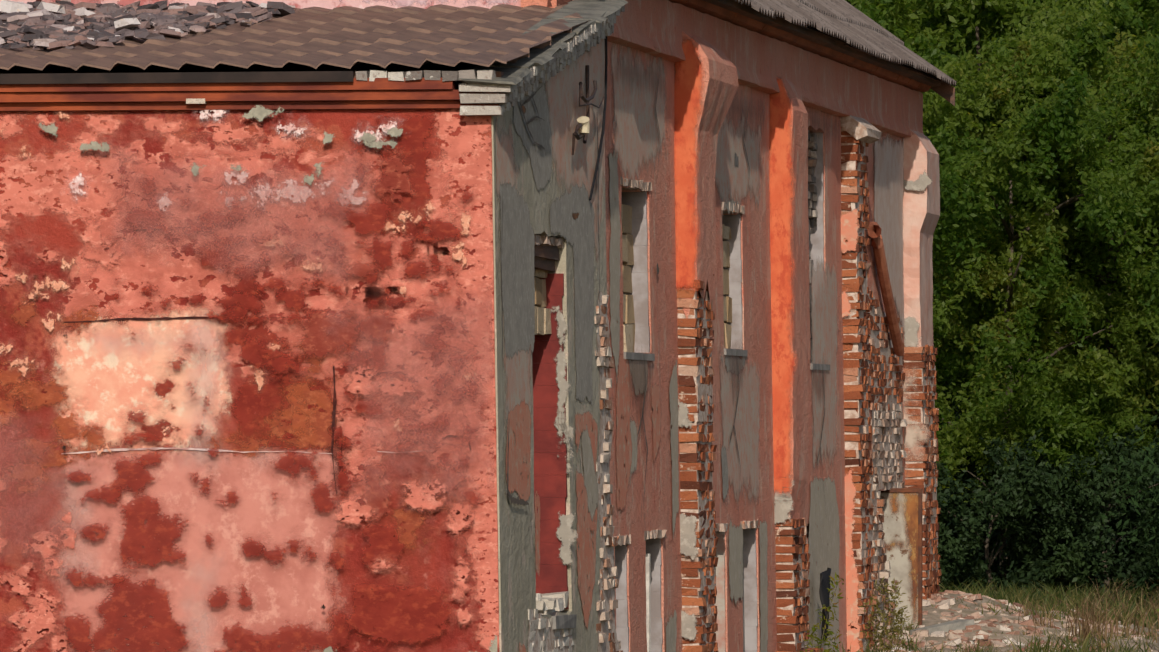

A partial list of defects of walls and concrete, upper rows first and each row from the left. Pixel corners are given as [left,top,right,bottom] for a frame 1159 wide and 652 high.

flaking render [0,39,702,652]
peeling [715,78,795,652]
spalling [807,130,932,652]